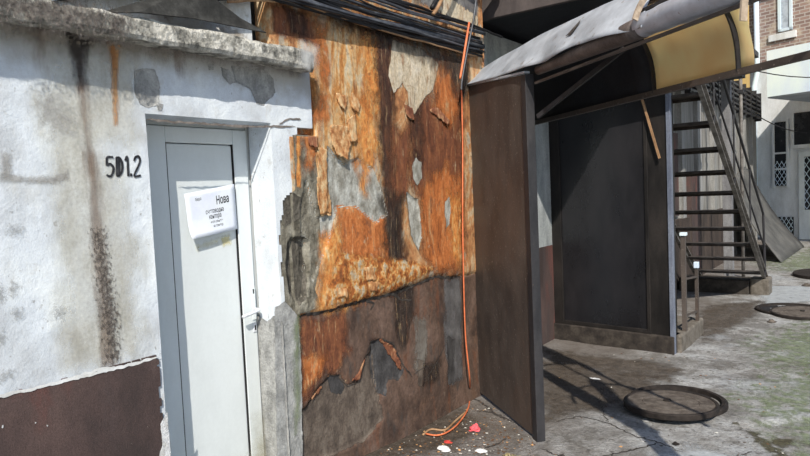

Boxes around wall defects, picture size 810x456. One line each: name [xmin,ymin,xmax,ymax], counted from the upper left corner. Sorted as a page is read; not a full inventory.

corrosion [109,45,120,124]
peeling [134,68,163,110]
peeling [208,64,275,105]
flaking render [389,40,438,120]
leakage [0,0,141,364]
corrosion [272,5,466,404]
peeling [257,93,404,456]
crack [548,406,692,456]